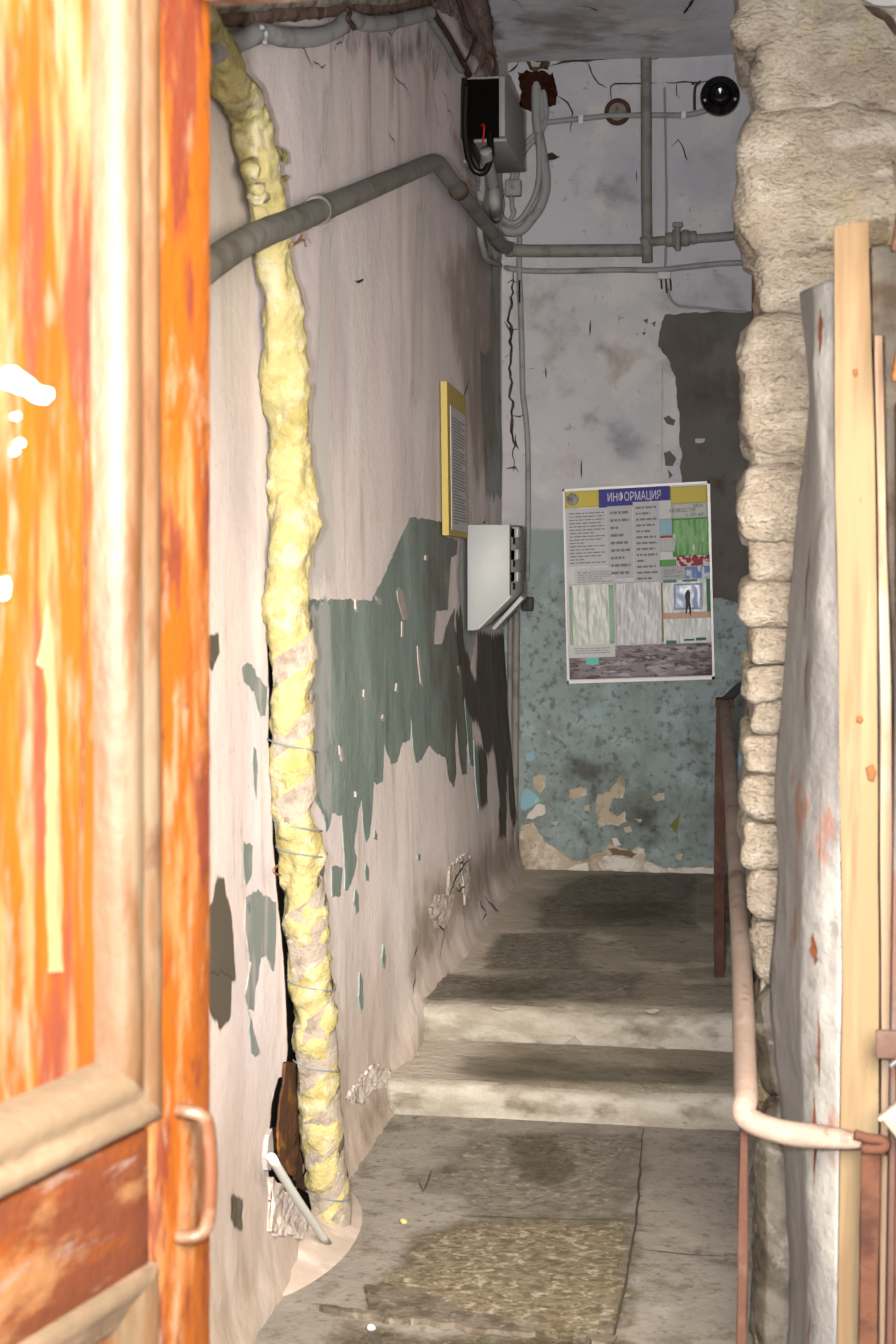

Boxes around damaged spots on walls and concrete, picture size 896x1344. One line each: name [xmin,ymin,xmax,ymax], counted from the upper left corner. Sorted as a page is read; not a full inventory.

peeling [435,0,502,77]
spalling [518,60,558,111]
crack [464,260,523,524]
peeling [664,451,676,479]
peeling [308,517,481,914]
flaking render [519,752,714,874]
flaking render [429,851,471,929]
flaking render [345,1063,395,1104]